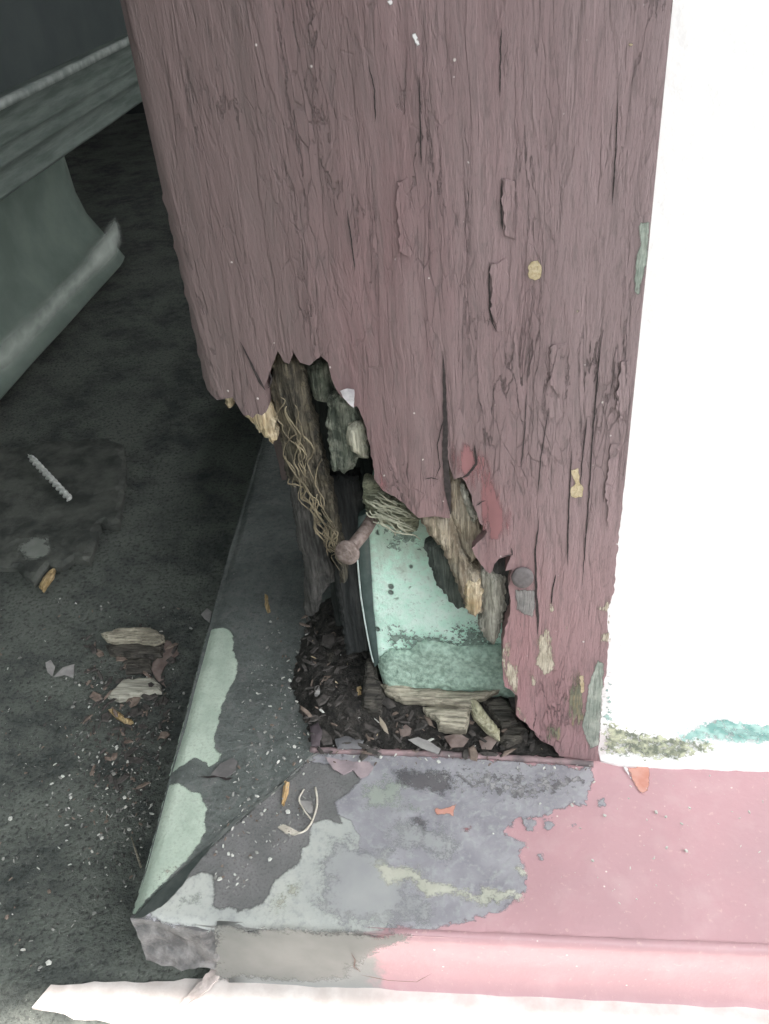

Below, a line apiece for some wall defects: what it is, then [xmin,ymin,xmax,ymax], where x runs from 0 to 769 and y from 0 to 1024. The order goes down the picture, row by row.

crack [611,99,619,203]
crack [497,183,505,230]
peeling [501,179,520,239]
crack [488,265,496,330]
peeling [489,258,512,332]
peeling [340,388,355,408]
crack [426,358,477,514]
crack [506,344,601,634]
peeling [502,643,519,694]
peeling [532,629,555,686]
mould [600,684,769,761]
peeling [300,723,606,936]